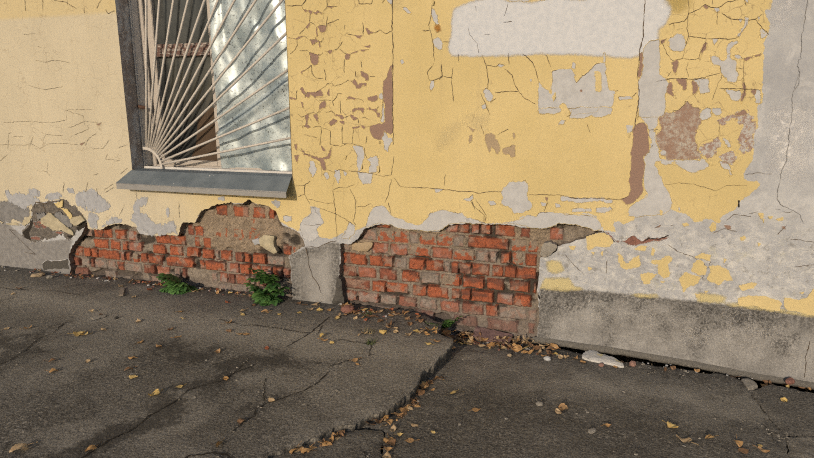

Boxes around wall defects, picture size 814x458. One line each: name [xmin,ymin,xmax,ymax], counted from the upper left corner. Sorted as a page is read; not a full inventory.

peeling [423,0,454,101]
crack [0,109,127,189]
flaking render [0,185,324,297]
crack [220,317,329,347]
crack [287,0,498,293]
flaking render [332,39,757,345]
peeling [679,253,814,317]
flaking render [709,200,790,241]
crack [81,339,372,458]